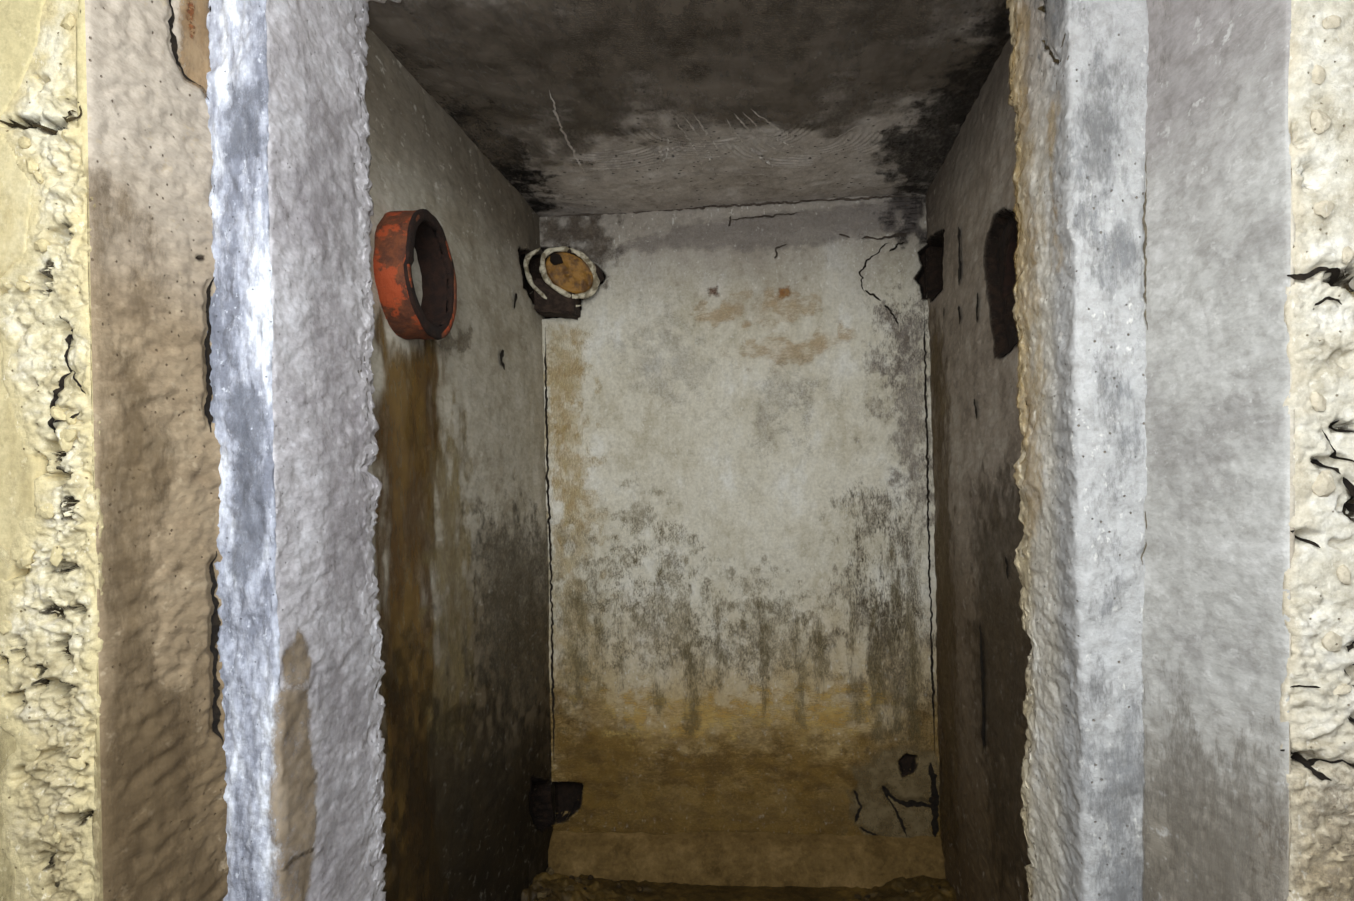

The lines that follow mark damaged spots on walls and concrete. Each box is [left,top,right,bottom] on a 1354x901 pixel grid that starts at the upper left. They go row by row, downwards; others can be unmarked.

crack [168,0,209,100]
water stain [390,29,639,217]
crack [553,195,920,258]
water stain [876,5,1010,244]
spalling [0,0,105,901]
crack [204,277,215,433]
crack [209,551,224,744]
water stain [385,300,958,901]
crack [839,227,979,837]
spalling [1279,0,1354,901]